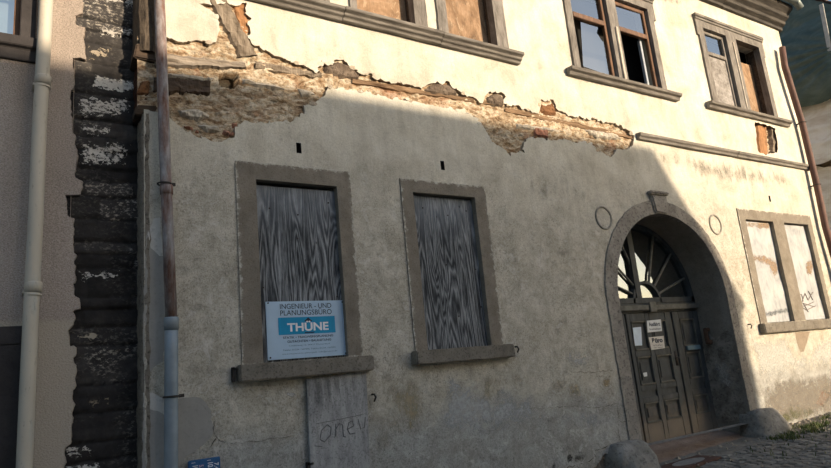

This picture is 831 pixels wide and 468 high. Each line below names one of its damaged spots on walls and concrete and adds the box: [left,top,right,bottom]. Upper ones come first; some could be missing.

spalling [137,53,158,112]
spalling [166,0,634,157]
spalling [755,122,778,155]
peeling [143,217,165,373]
water stain [766,374,831,421]